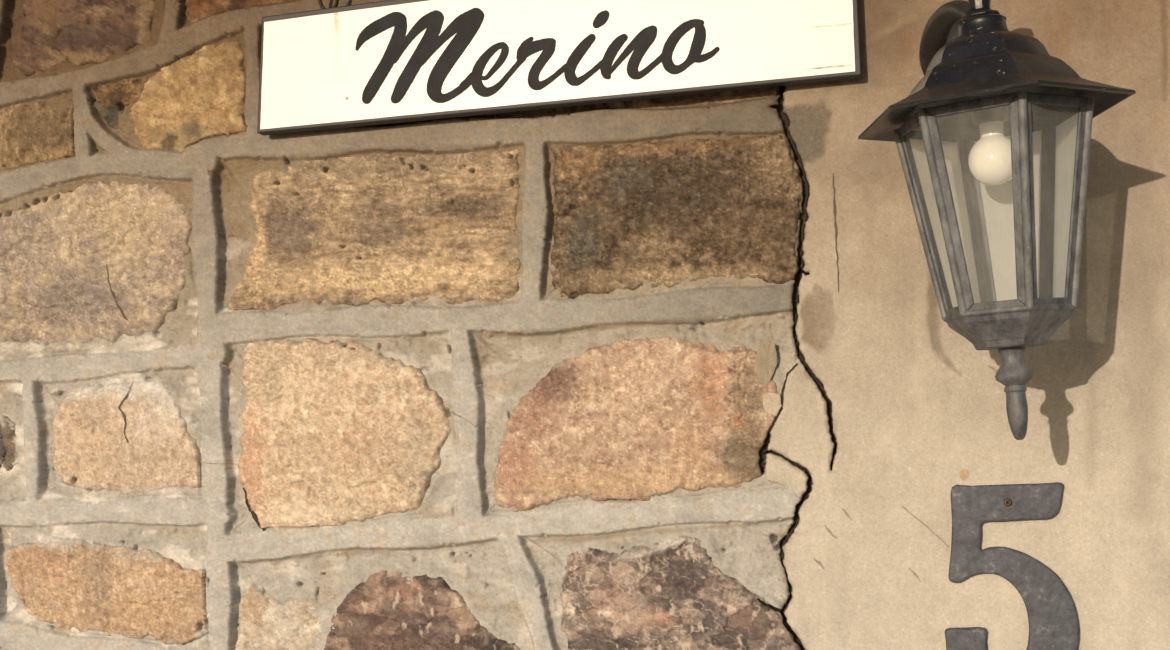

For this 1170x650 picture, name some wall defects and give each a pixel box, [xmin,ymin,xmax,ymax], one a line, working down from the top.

crack [118,383,133,442]
crack [758,86,837,650]